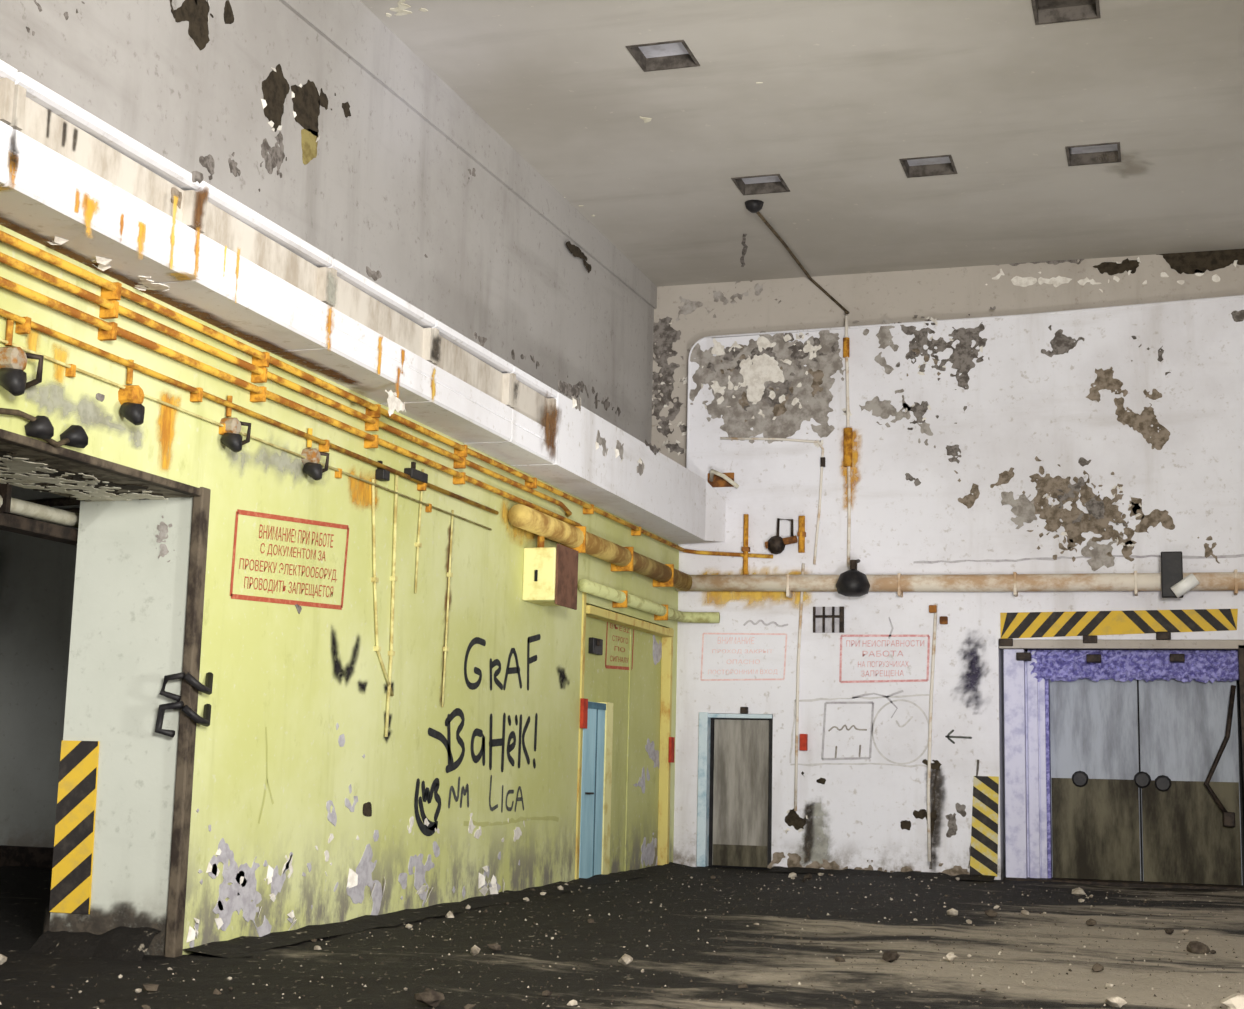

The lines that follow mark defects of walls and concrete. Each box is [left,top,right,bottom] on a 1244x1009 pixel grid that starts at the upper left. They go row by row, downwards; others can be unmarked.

peeling [170,0,234,50]
peeling [260,64,351,178]
rust [75,191,98,234]
rust [138,222,146,254]
rust [170,188,208,281]
peeling [985,257,1147,292]
spalling [1156,249,1244,285]
peeling [0,449,168,502]
rust [158,394,180,469]
rust [842,431,859,507]
peeling [595,280,1175,571]
peeling [198,784,440,937]